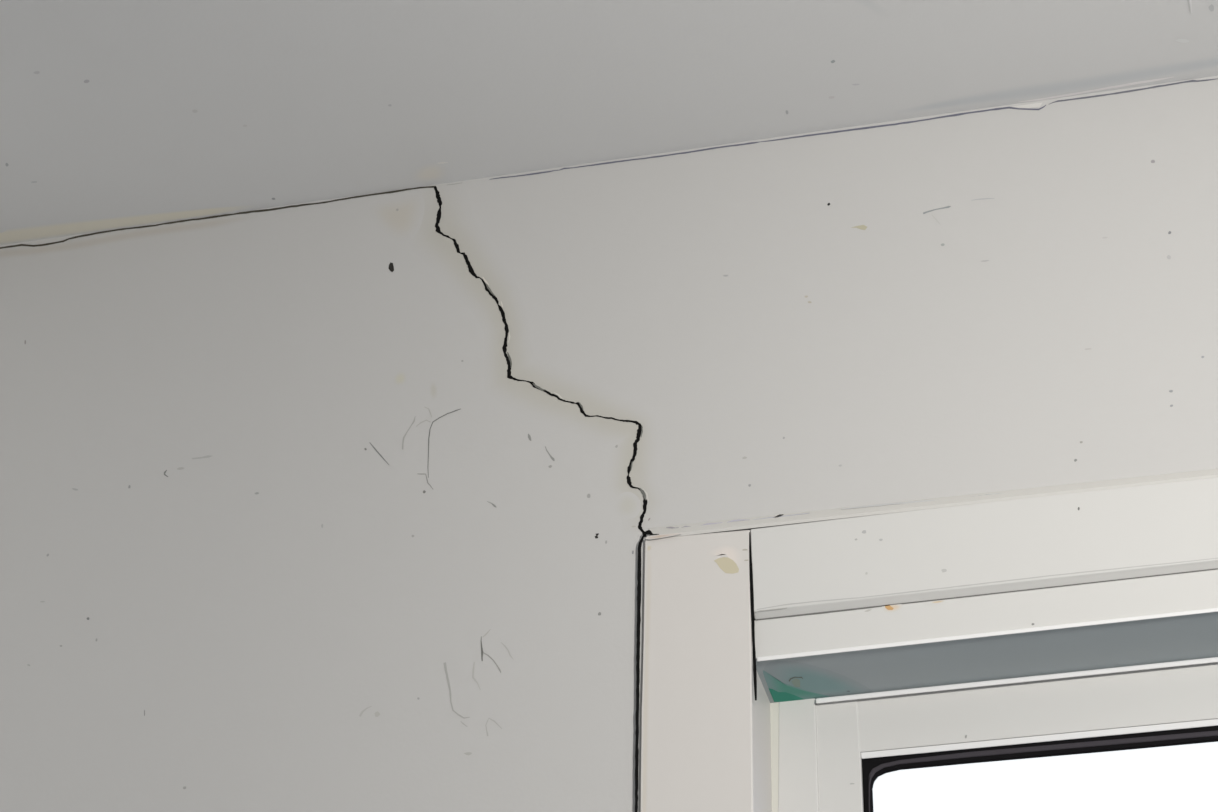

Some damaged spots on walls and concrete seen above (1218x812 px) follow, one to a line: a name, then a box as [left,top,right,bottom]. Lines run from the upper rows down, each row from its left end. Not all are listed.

crack [489,78,1218,180]
crack [0,183,659,537]